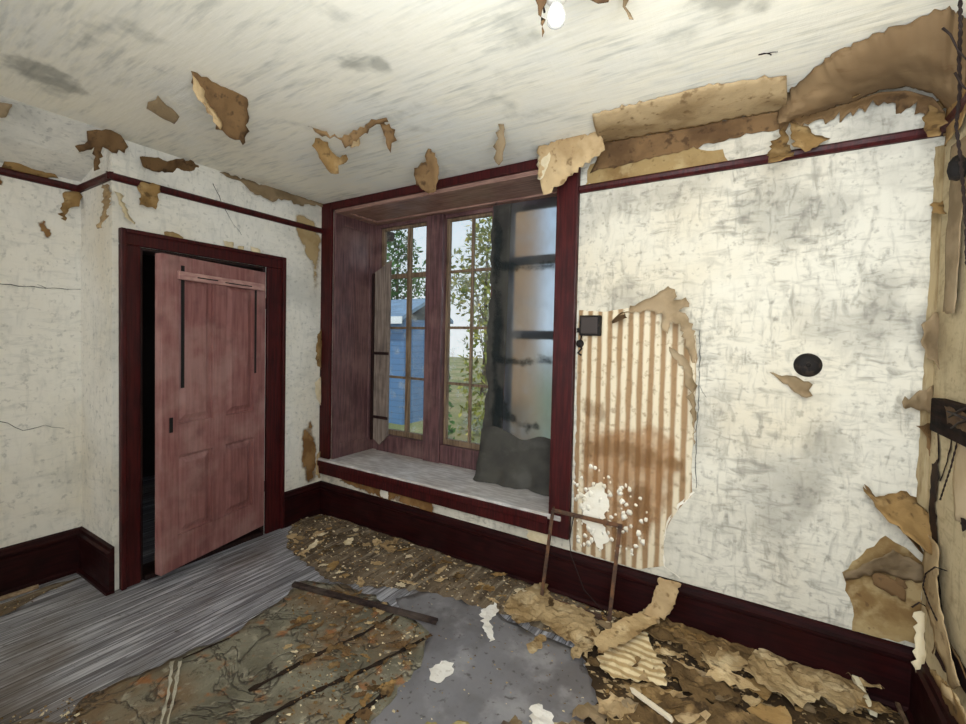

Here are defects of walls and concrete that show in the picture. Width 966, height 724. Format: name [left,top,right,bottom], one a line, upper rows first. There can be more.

flaking render [586,147,728,185]
flaking render [572,308,698,569]
flaking render [842,536,923,644]